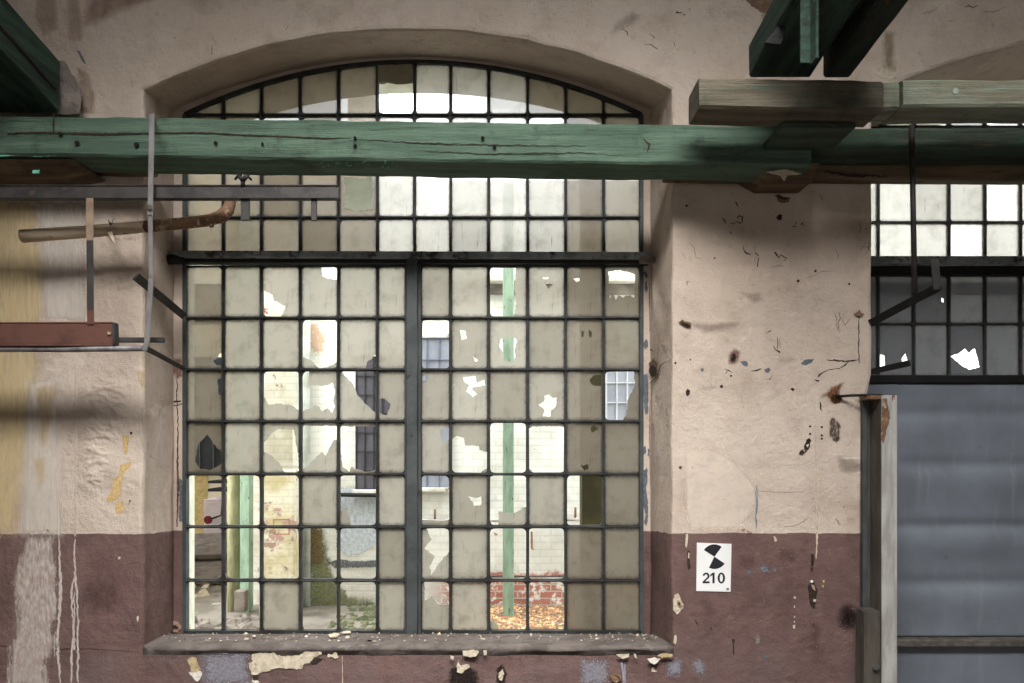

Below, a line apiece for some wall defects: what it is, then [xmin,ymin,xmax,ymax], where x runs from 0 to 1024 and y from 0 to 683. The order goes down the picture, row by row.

leakage [0,202,85,322]
crack [815,312,860,410]
corrosion [881,398,890,444]
leakage [0,352,80,683]
peeling [673,594,684,614]
spalling [808,579,825,608]
peeling [187,657,202,681]
peeling [249,651,338,683]